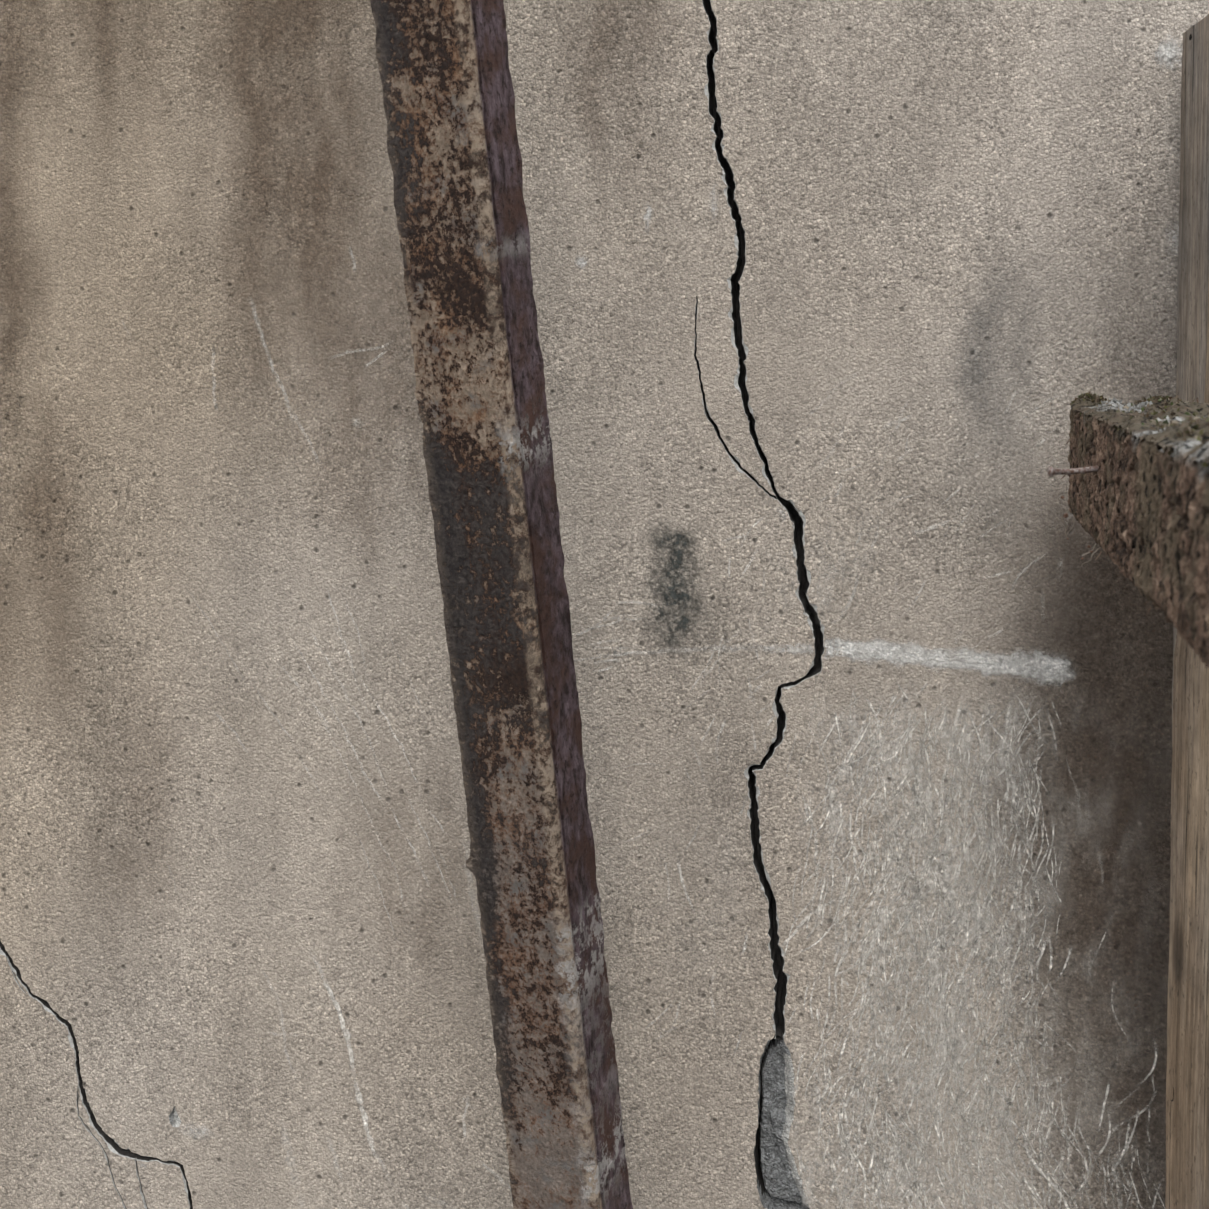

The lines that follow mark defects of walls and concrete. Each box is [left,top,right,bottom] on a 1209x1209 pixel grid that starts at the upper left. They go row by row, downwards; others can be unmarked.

mould [650,532,699,645]
crack [694,0,825,1040]
leakage [785,526,1174,1209]
crack [0,941,193,1209]
spalling [754,1024,810,1209]